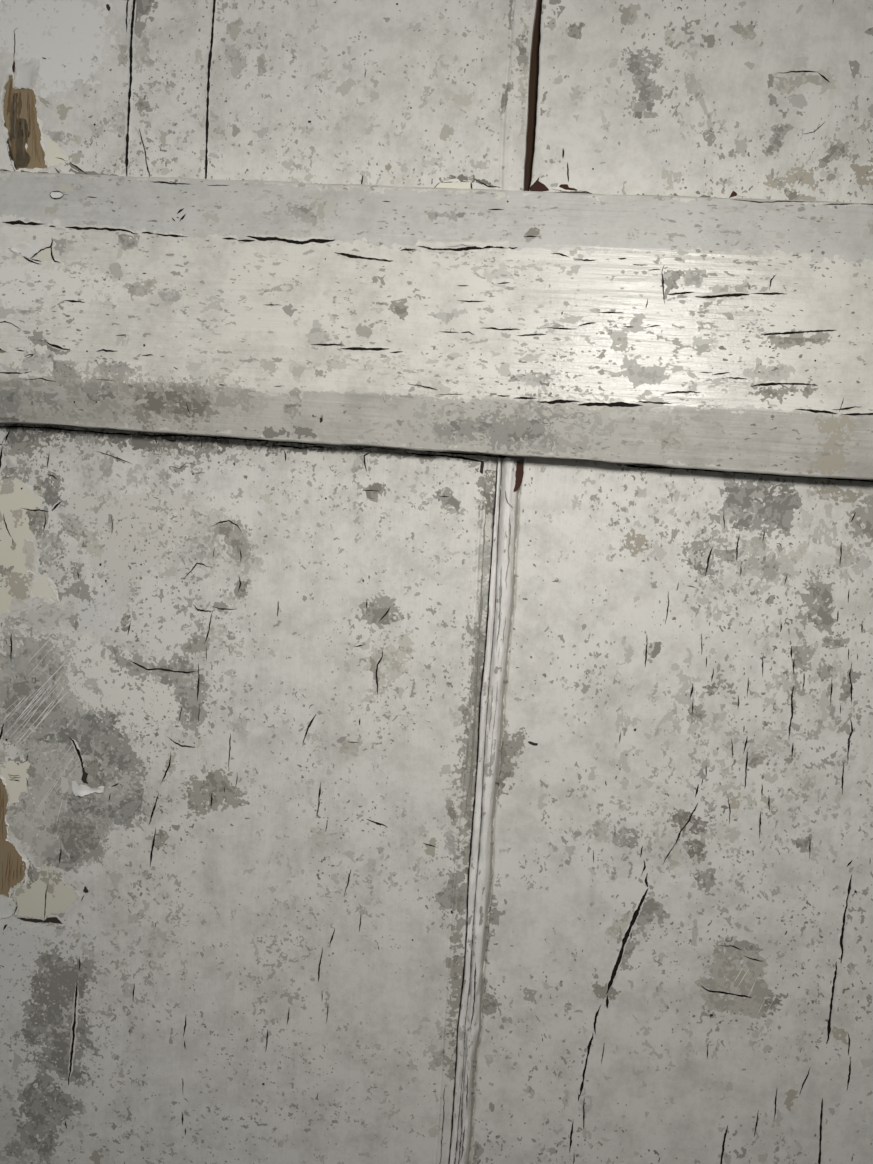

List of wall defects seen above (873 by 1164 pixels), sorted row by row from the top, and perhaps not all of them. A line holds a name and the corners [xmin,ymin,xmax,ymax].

peeling [0,58,70,173]
crack [3,0,227,264]
crack [311,344,403,353]
crack [222,236,784,336]
crack [498,372,873,416]
crack [763,328,835,336]
peeling [0,479,60,616]
crack [645,511,782,713]
crack [130,520,242,866]
peeling [0,757,88,924]
peeling [72,762,104,797]
crack [569,591,871,1164]